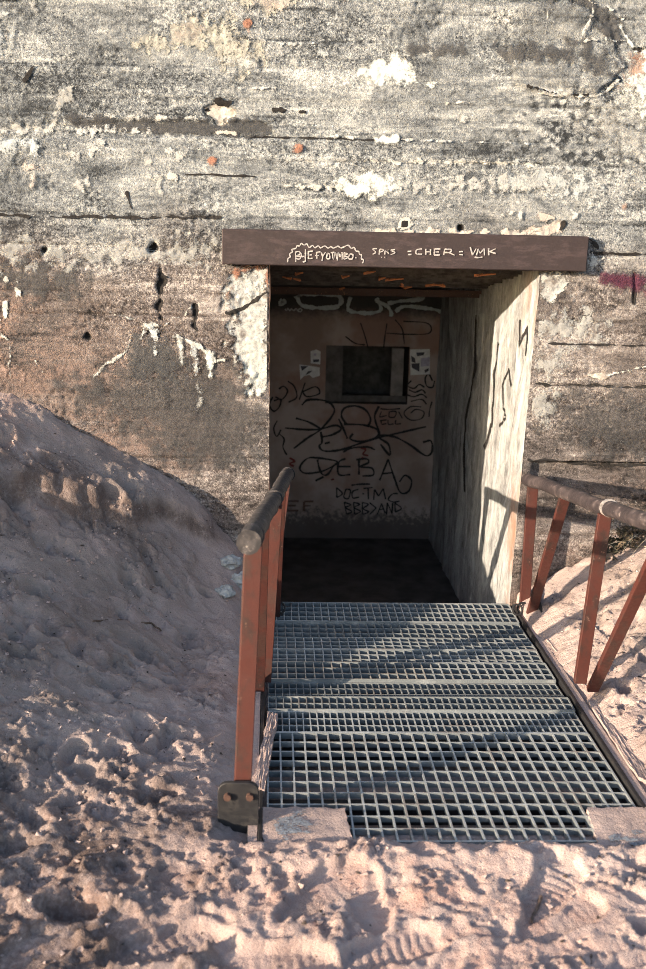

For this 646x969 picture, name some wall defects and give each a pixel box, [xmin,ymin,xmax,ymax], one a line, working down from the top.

peeling [123,0,302,87]
crack [582,0,643,52]
spalling [355,52,437,88]
crack [524,78,623,99]
spalling [204,97,237,136]
water stain [125,322,225,406]